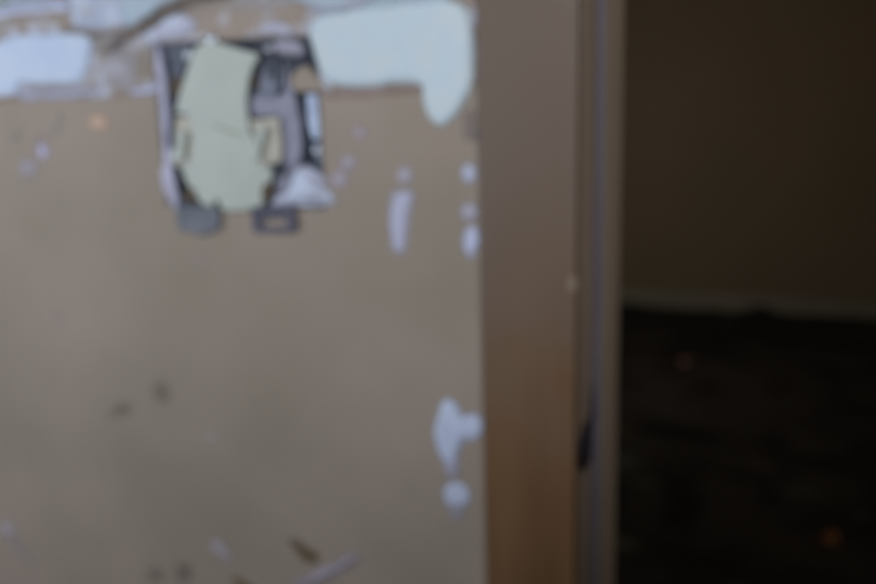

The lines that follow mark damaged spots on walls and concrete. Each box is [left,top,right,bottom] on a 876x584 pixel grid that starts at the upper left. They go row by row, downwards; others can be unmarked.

peeling [0,0,341,101]
peeling [451,0,478,84]